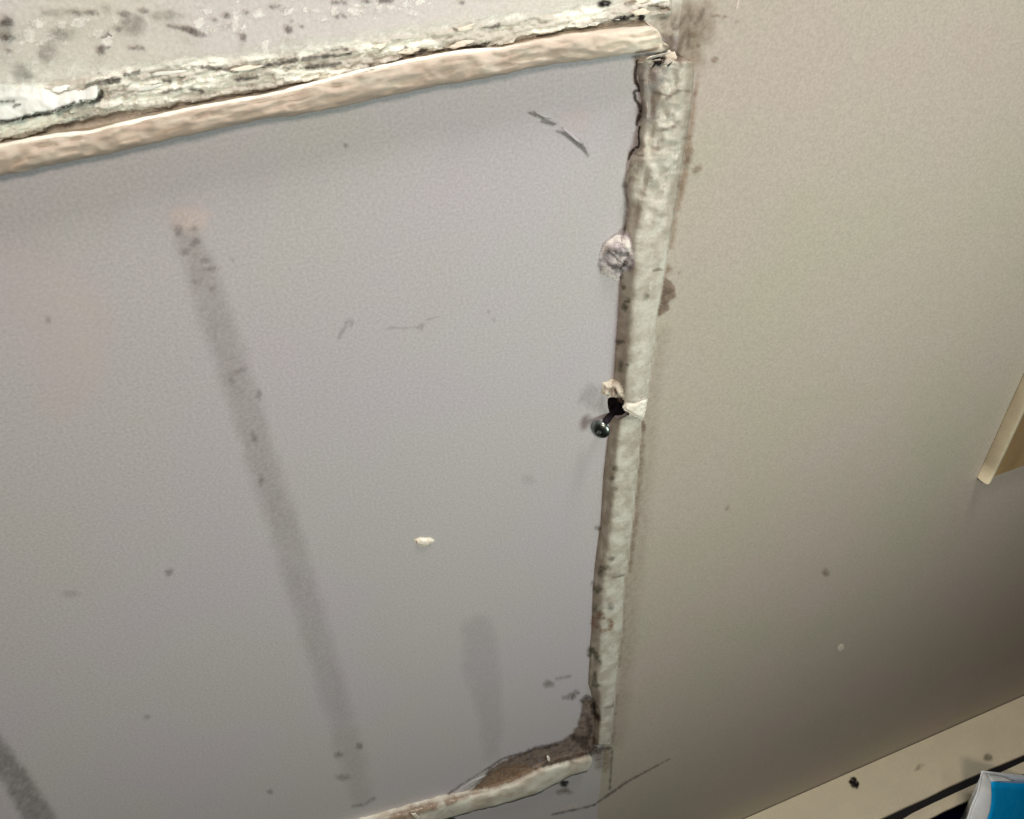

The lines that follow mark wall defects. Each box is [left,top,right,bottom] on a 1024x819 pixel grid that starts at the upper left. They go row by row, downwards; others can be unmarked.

peeling [0,0,675,142]
crack [628,59,677,160]
spalling [639,50,688,94]
damp [663,12,702,61]